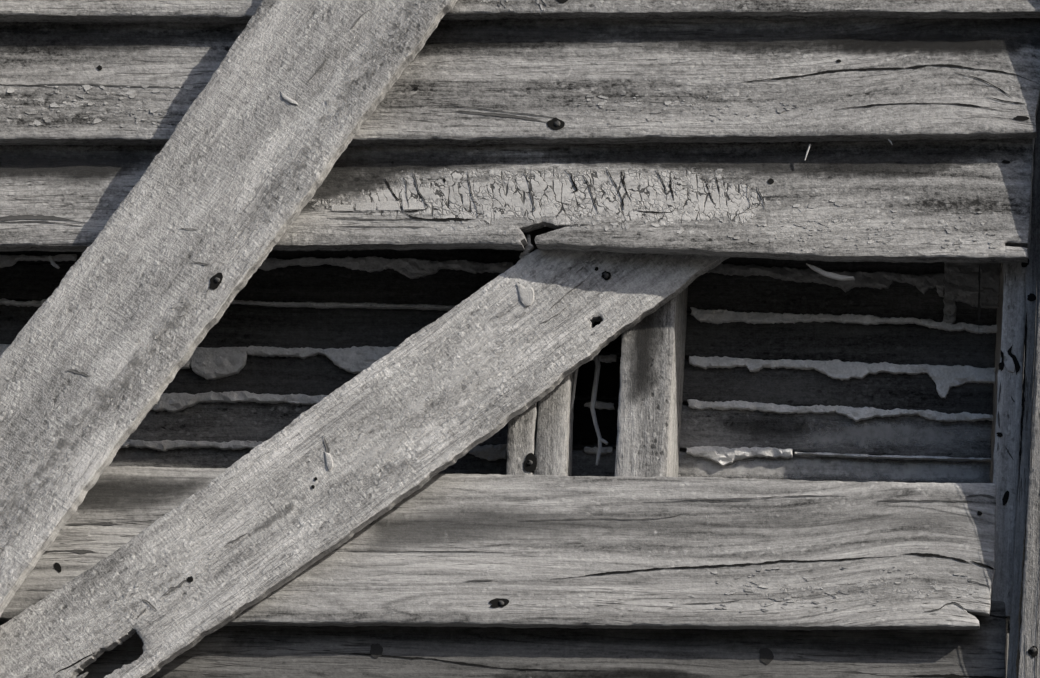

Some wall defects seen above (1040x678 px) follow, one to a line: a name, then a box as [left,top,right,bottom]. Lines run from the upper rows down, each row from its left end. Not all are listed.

crack [728,64,1040,111]
crack [621,170,675,213]
crack [705,177,792,214]
crack [518,265,1040,678]
crack [334,547,483,555]